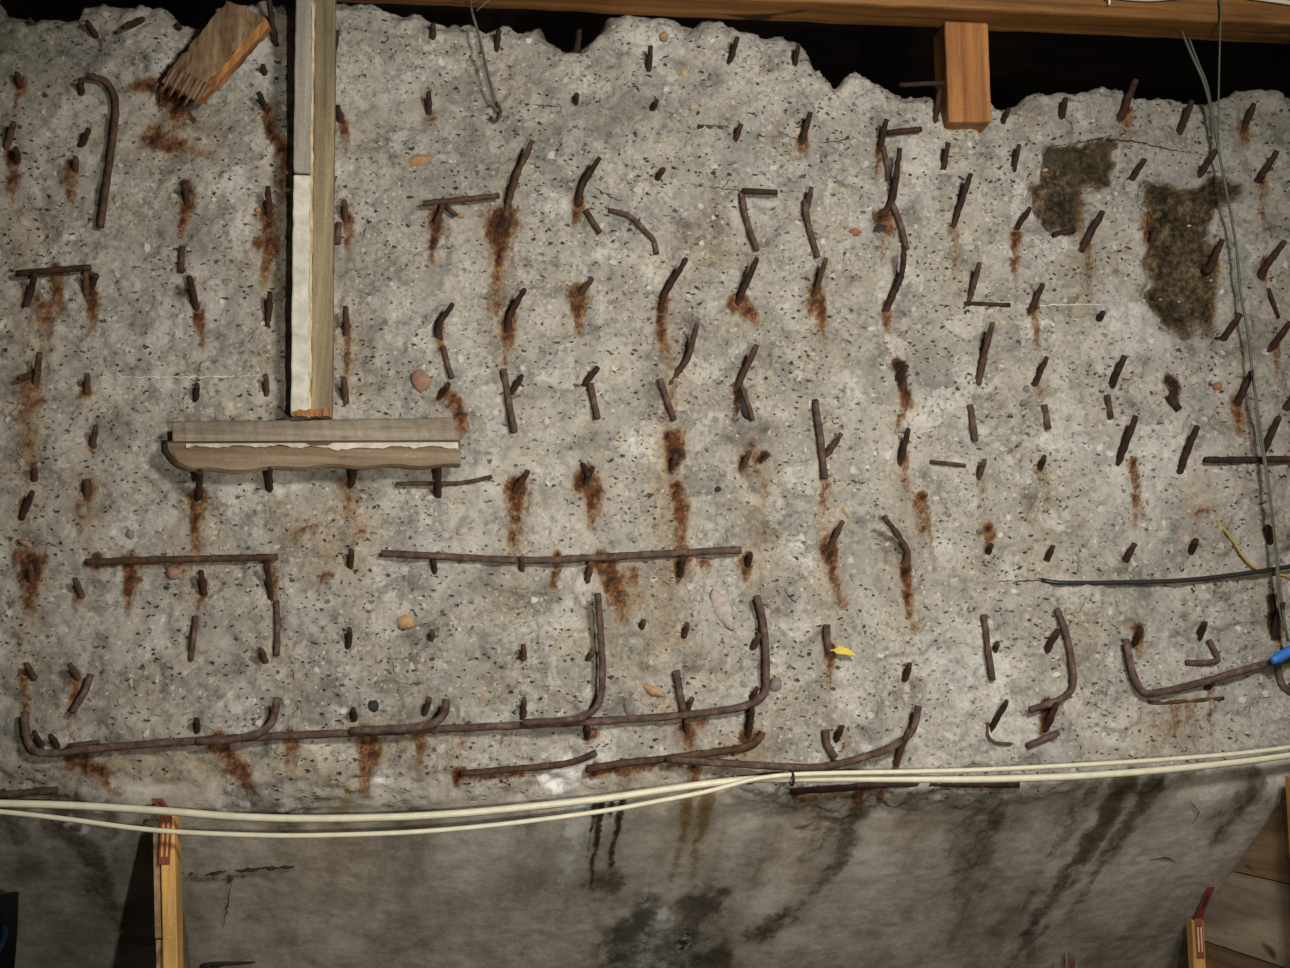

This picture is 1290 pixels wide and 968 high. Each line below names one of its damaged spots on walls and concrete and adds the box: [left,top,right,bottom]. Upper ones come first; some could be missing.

rust [252,102,290,285]
rust [479,204,523,364]
spalling [1013,140,1118,253]
spalling [1128,149,1279,341]
rust [572,463,606,528]
rust [662,390,712,583]
spalling [21,546,1020,795]
spalling [985,607,1077,749]
leakage [598,883,801,968]
leakage [810,806,869,895]
leakage [950,800,1008,911]
leakage [1014,766,1165,958]